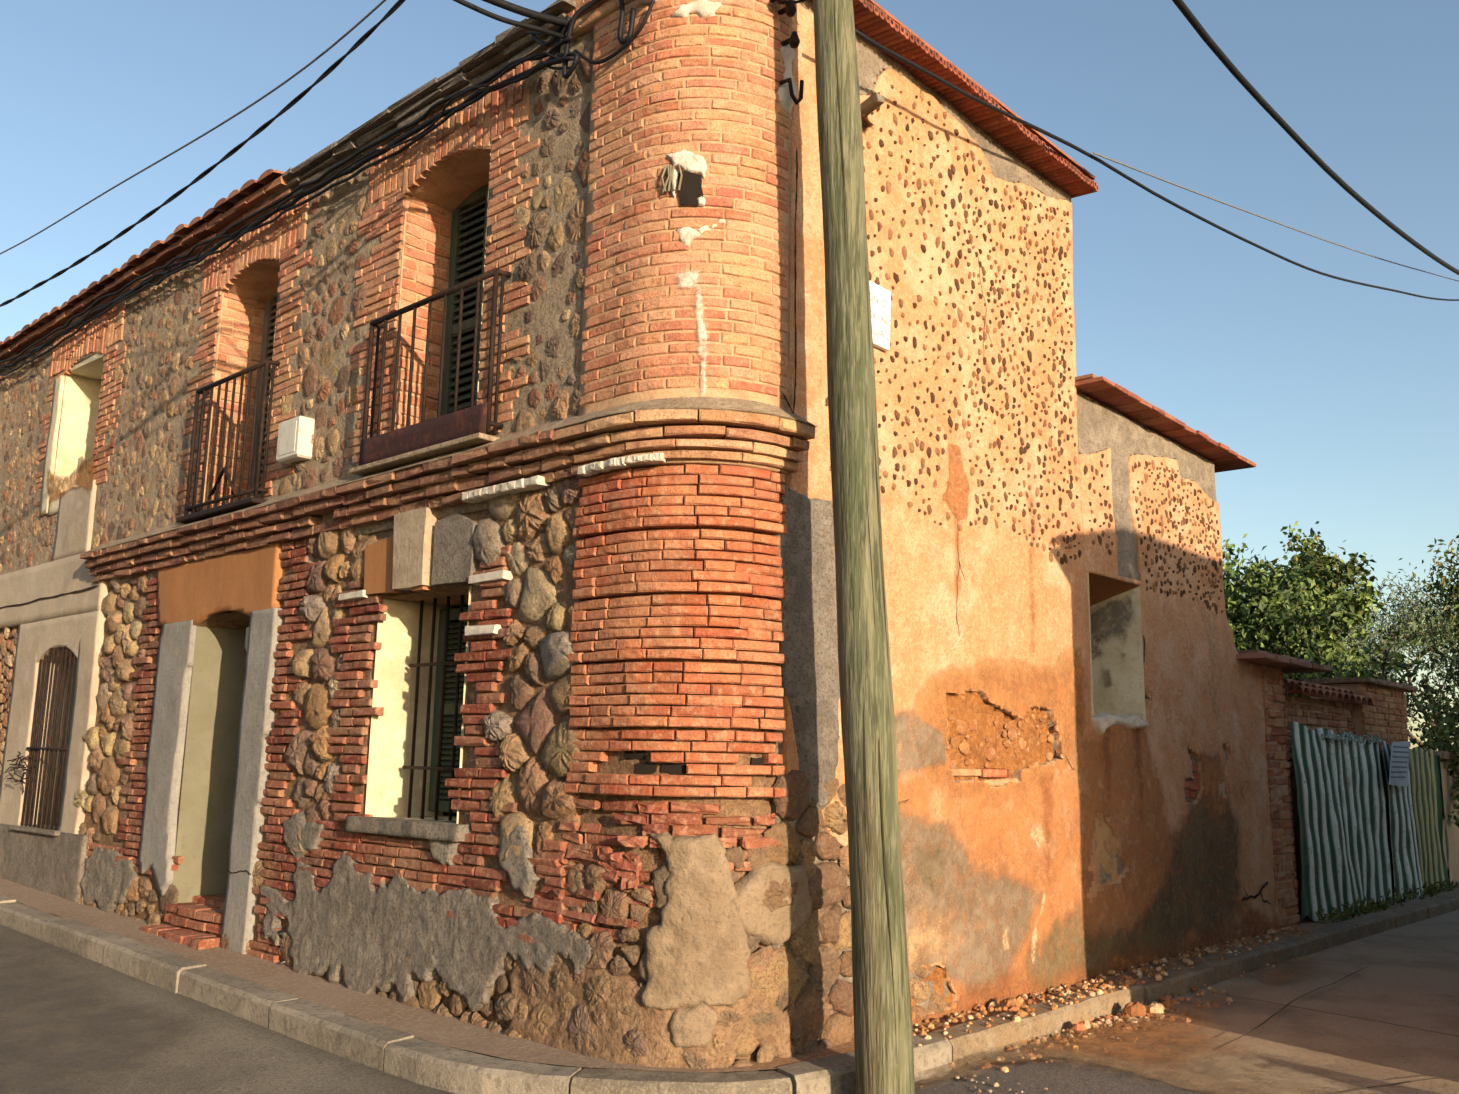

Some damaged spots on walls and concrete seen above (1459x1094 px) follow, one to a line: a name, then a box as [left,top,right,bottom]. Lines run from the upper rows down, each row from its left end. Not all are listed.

spalling [661,150,707,207]
water stain [679,272,707,395]
spalling [624,750,688,775]
spalling [750,757,767,765]
spalling [945,691,1064,787]
water stain [895,648,1276,1027]